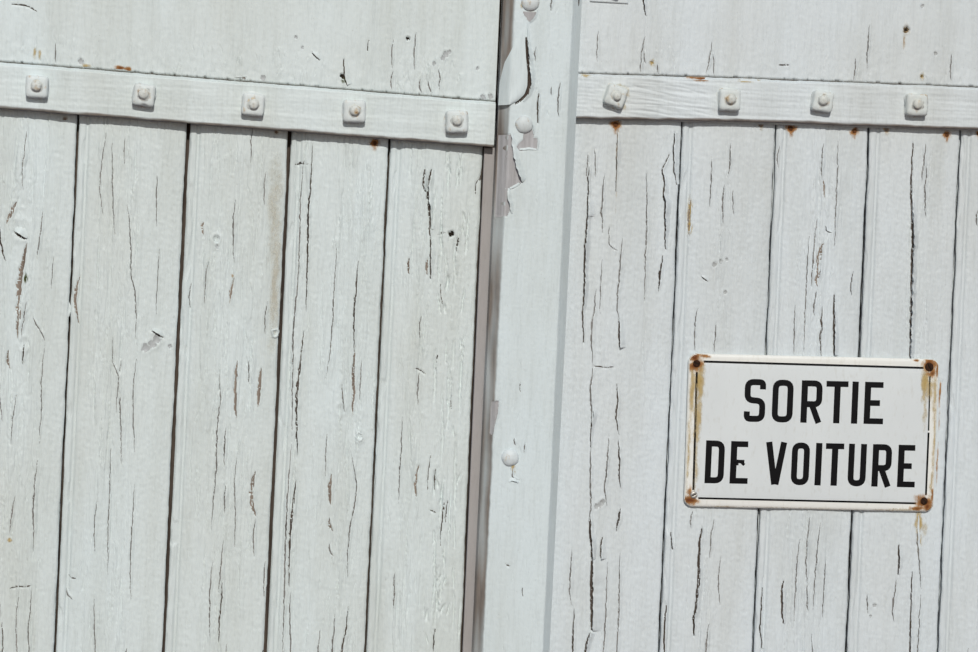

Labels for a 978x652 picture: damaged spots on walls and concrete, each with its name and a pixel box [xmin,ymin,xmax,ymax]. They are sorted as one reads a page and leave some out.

crack [0,228,8,261]
peeling [480,10,541,217]
peeling [582,164,596,342]
peeling [661,133,679,249]
peeling [909,143,919,359]
crack [0,301,46,552]
crack [93,133,162,600]
crack [209,144,364,652]
corrosion [687,354,710,476]
corrosion [908,359,941,511]
crack [0,585,33,652]
peeling [584,498,607,652]